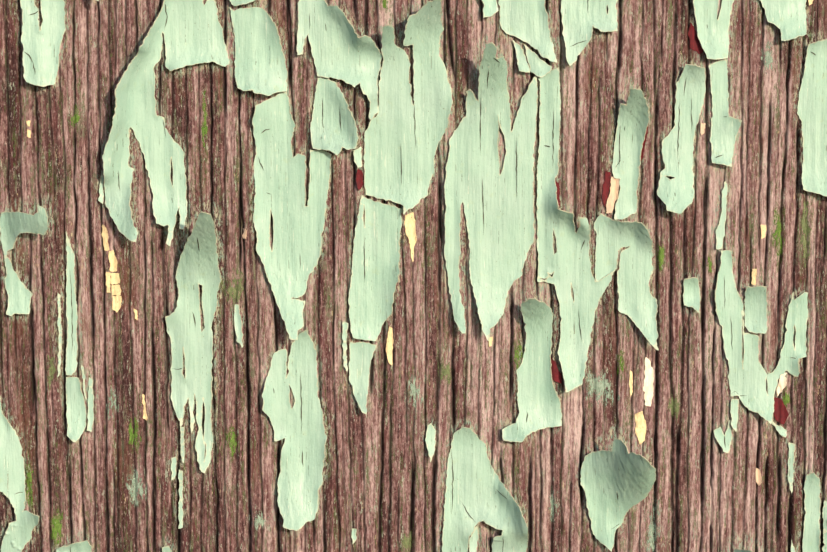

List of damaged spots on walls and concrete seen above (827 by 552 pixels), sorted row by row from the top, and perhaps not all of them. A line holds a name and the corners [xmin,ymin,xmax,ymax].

peeling [20,0,66,87]
peeling [657,0,742,214]
peeling [760,0,827,197]
peeling [0,204,48,316]
peeling [57,232,94,443]
peeling [98,0,659,531]
peeling [683,277,701,313]
peeling [714,181,809,494]
peeling [0,396,40,552]
peeling [441,427,528,552]
peeling [580,438,656,552]
peeling [791,472,827,552]